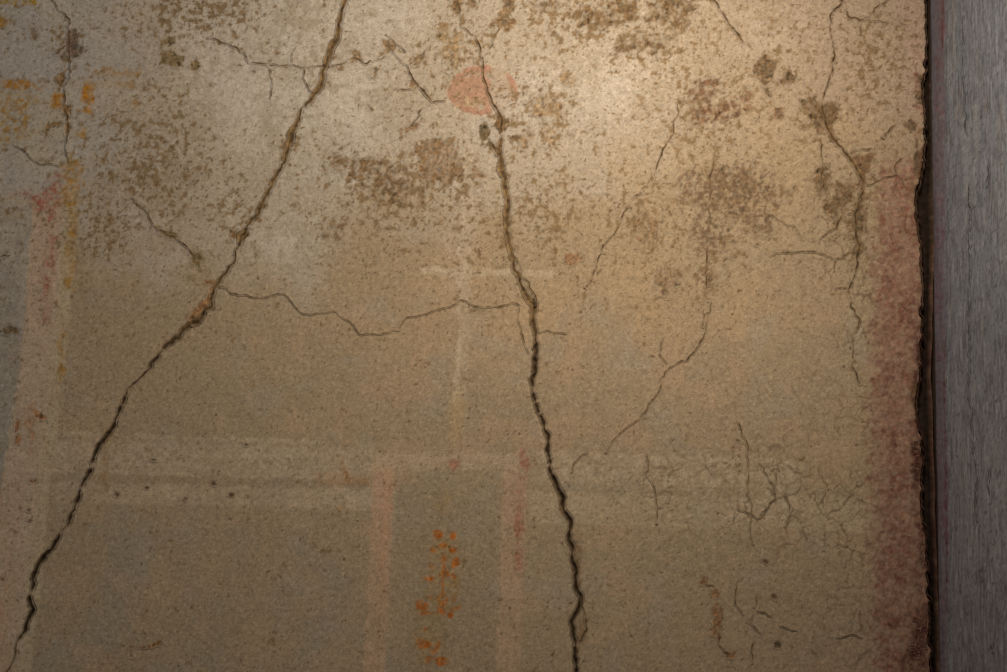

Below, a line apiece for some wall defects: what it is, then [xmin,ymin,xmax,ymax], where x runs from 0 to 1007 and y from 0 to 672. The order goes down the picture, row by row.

crack [682,0,753,50]
crack [5,0,718,672]
crack [762,0,940,672]
crack [735,419,791,545]
crack [701,577,797,664]